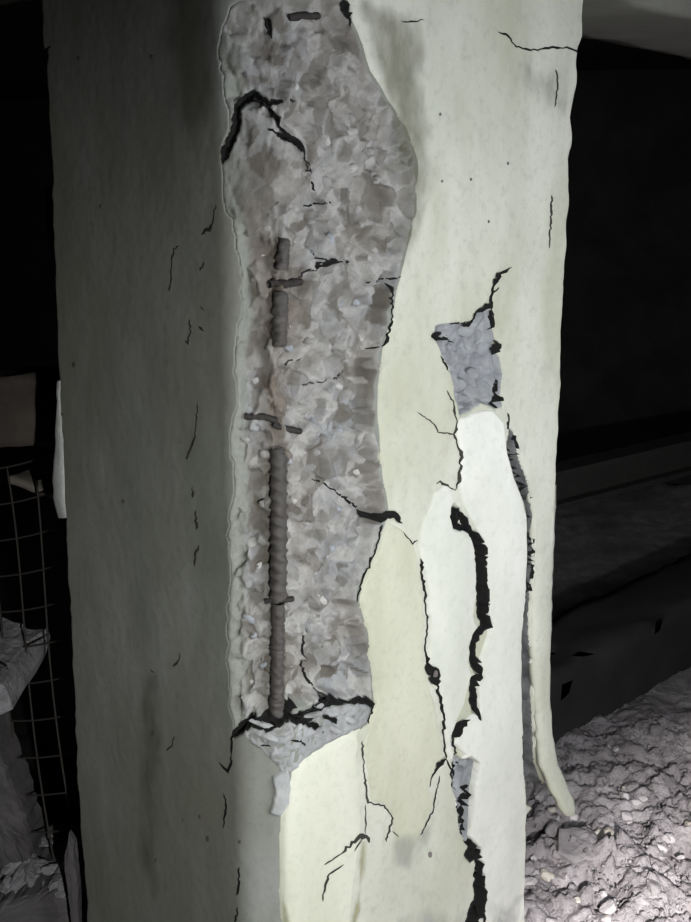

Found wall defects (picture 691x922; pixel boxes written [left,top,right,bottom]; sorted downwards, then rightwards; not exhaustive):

crack [499,32,577,107]
crack [221,90,331,207]
crack [546,195,554,248]
crack [284,358,346,386]
spalling [432,309,502,415]
spalling [218,0,478,922]
crack [489,379,535,620]
crack [312,267,512,922]
crack [219,630,399,901]
crack [233,867,241,922]